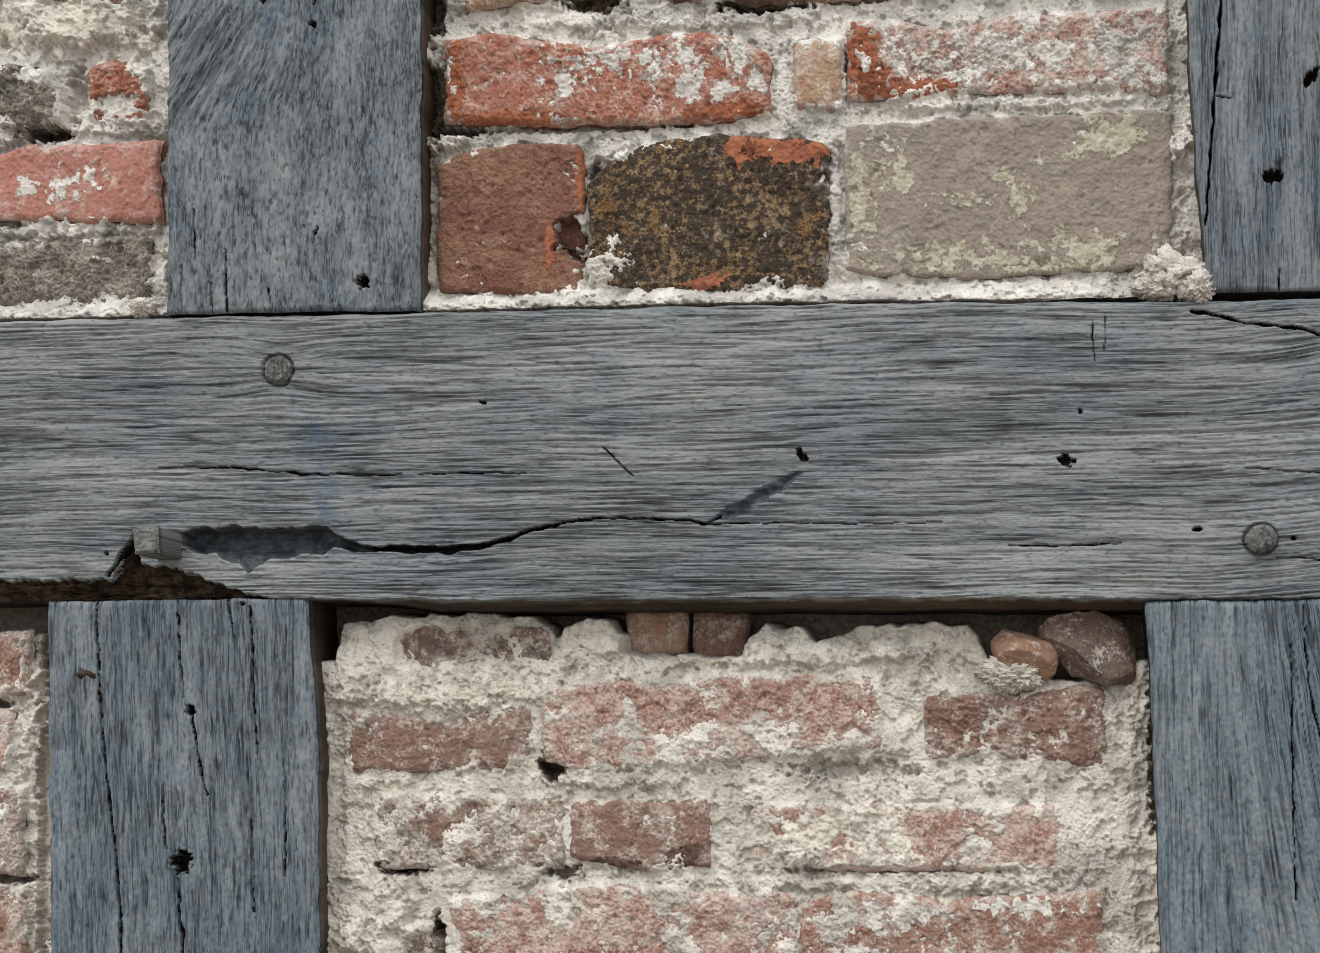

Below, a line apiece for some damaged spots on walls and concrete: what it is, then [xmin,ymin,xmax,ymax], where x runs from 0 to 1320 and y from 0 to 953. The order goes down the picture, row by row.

crack [1204,0,1224,226]
crack [1190,310,1319,336]
crack [200,466,391,476]
crack [432,469,484,477]
crack [375,517,780,555]
crack [175,613,183,680]
crack [228,600,259,752]
crack [96,535,135,953]
crack [191,716,209,796]
crack [281,822,289,877]
crack [177,892,185,953]